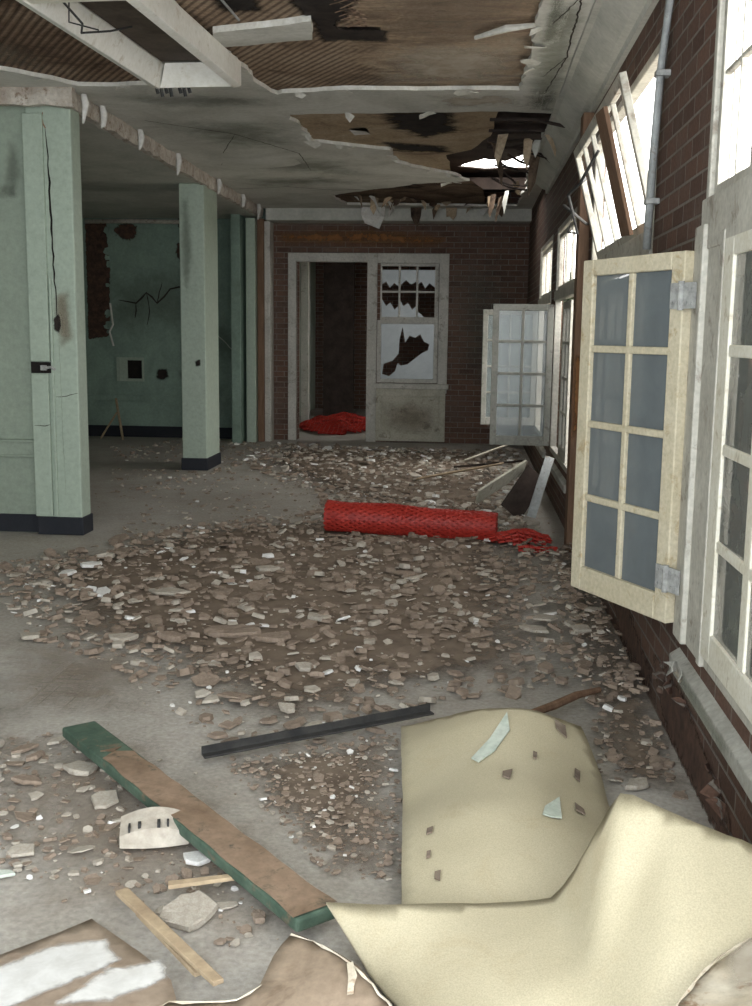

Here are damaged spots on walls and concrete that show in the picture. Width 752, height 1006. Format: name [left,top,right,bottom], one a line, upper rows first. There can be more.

spalling [0,0,141,89]
spalling [80,0,200,62]
spalling [175,0,303,36]
spalling [225,0,546,98]
crack [544,0,582,94]
spalling [290,111,504,220]
crack [35,112,77,490]
spalling [85,223,137,346]
crack [120,284,180,325]